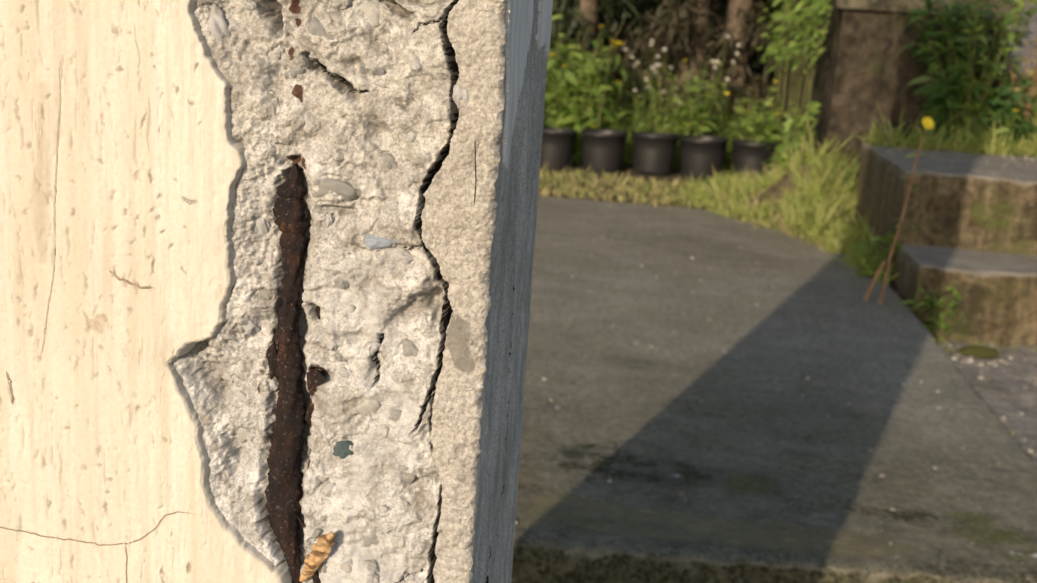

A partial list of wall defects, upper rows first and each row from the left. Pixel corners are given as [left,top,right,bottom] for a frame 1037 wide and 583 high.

rust [289,0,301,27]
rust [292,74,303,103]
rust [287,155,306,169]
crack [404,0,476,455]
spalling [173,0,507,583]
rust [307,365,327,401]
crack [0,511,195,583]
crack [396,493,442,583]